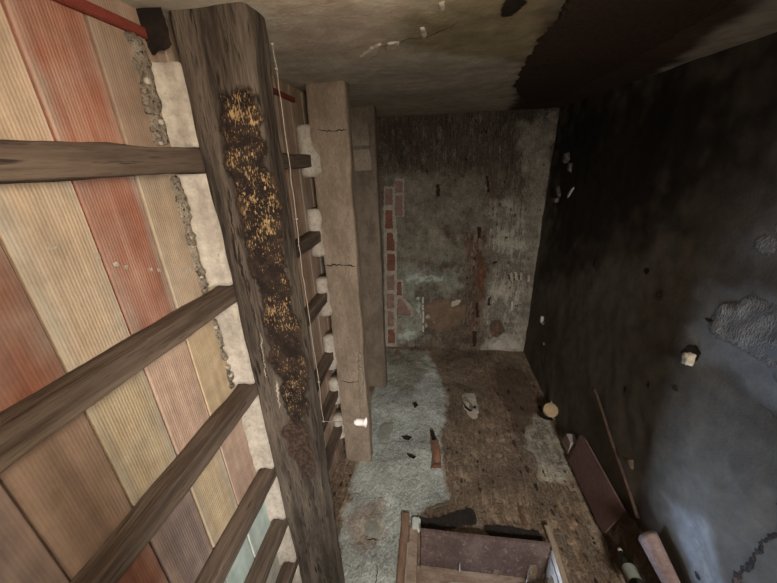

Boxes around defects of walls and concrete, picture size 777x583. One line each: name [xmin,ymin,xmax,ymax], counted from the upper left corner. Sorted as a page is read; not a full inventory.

crack [731,532,777,583]